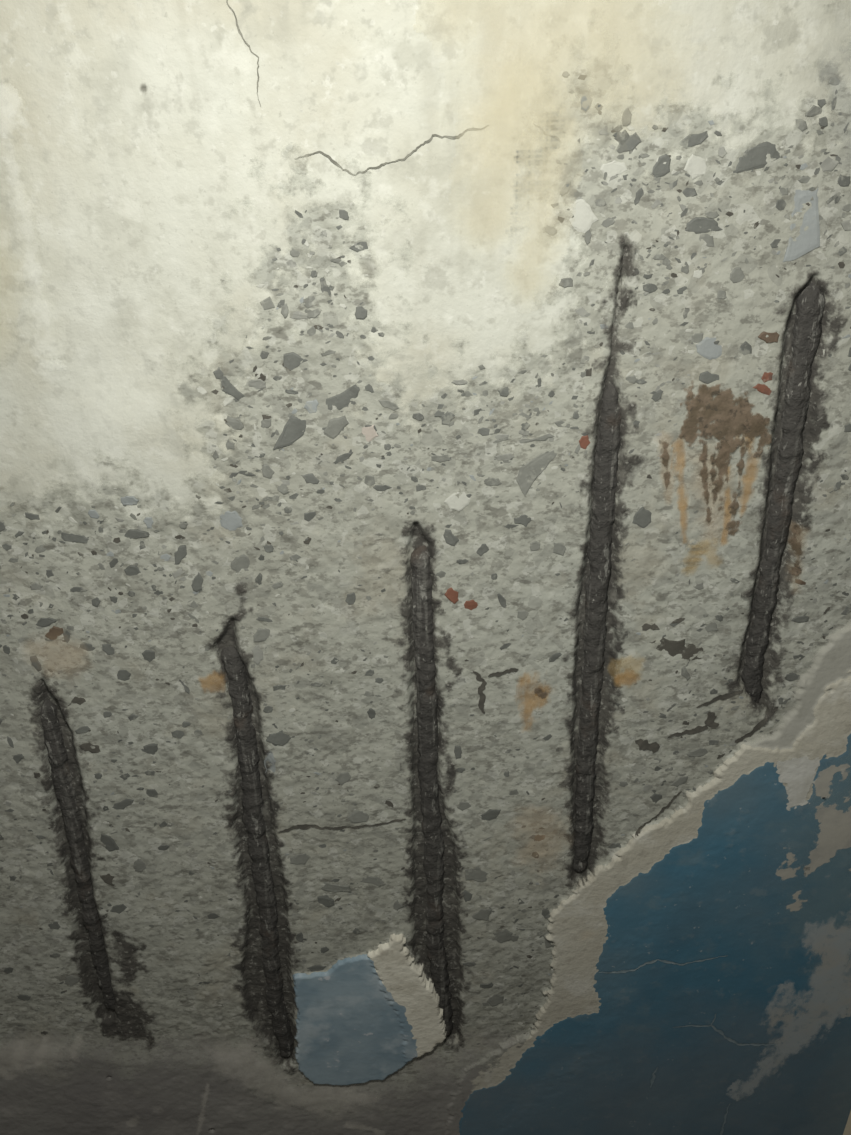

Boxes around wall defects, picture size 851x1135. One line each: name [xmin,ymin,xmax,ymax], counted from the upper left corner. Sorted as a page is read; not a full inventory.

crack [226,0,261,106]
crack [297,125,489,175]
corrosion [660,384,772,535]
spalling [728,272,847,719]
crack [278,819,406,833]
peeling [459,624,851,1135]
peeling [293,934,447,1086]